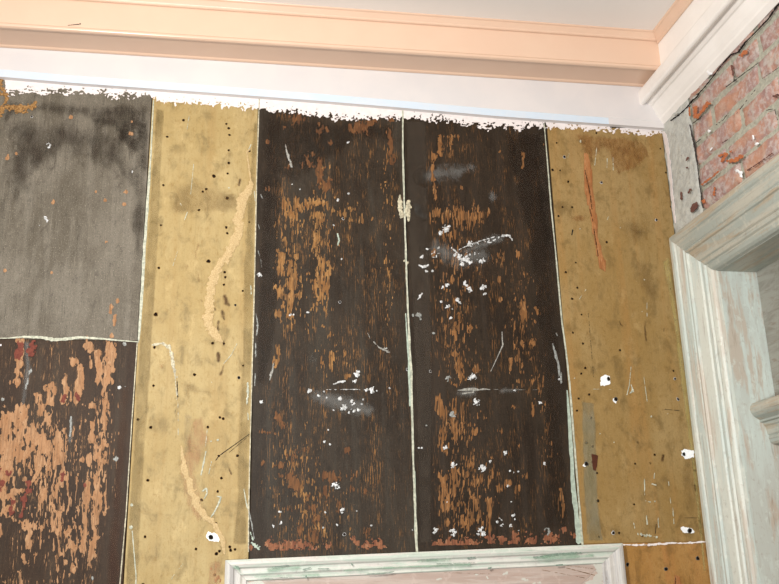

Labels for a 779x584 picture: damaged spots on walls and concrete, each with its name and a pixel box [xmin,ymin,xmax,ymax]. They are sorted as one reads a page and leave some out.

peeling [0,298,119,584]
peeling [259,411,387,551]
peeling [272,115,396,380]
peeling [429,134,576,546]
spalling [584,153,606,272]
crack [670,3,779,208]